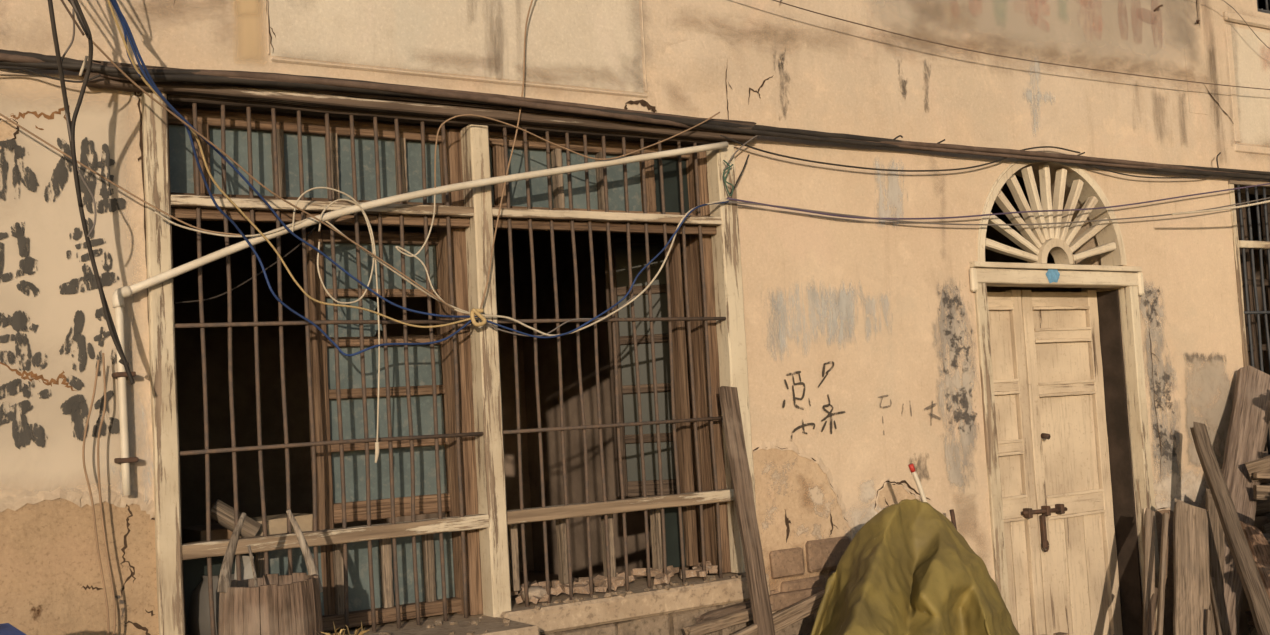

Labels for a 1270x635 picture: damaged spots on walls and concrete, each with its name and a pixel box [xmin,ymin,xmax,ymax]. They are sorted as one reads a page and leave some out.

mould [934,287,977,487]
mould [1140,287,1180,482]
peeling [0,486,159,635]
crack [83,505,155,635]
peeling [752,439,922,595]